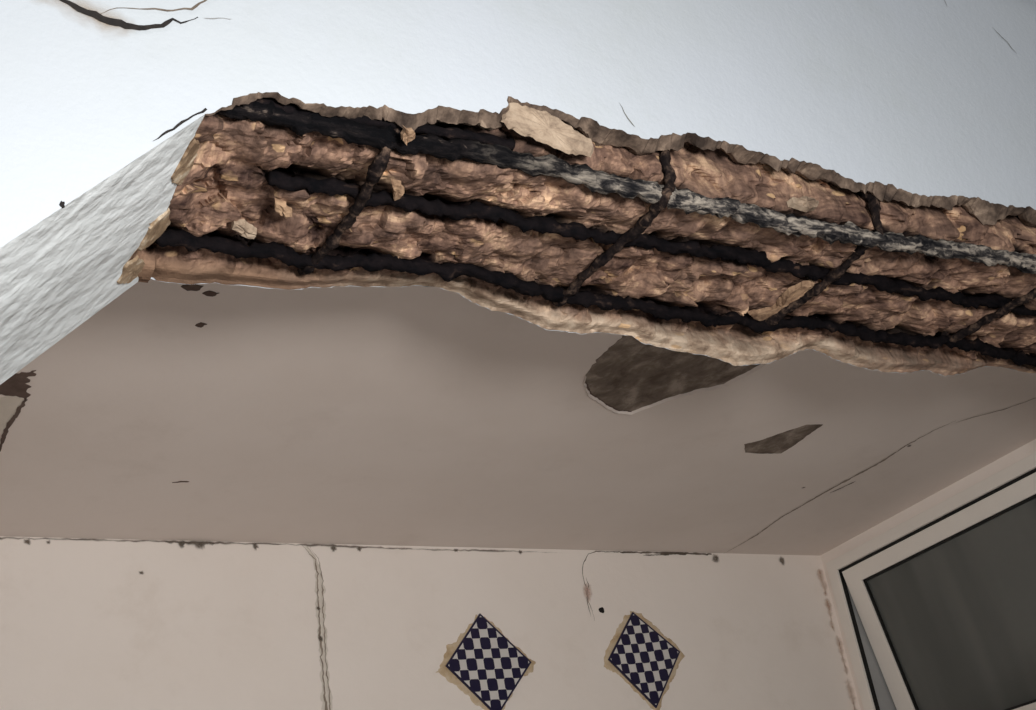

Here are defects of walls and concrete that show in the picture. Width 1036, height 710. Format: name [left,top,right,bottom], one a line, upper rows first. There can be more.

crack [60,0,227,30]
spalling [117,92,1036,415]
peeling [0,370,36,451]
peeling [744,424,823,454]
crack [0,537,431,710]